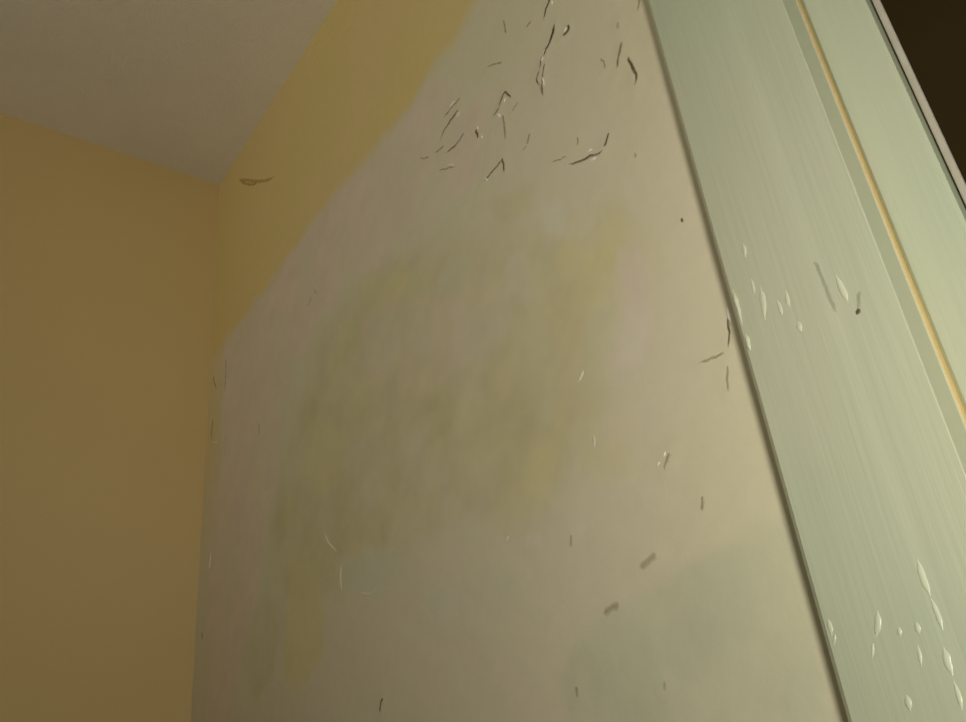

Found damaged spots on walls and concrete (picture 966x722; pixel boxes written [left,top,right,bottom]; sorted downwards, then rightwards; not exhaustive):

crack [503,0,569,95]
crack [604,46,637,82]
crack [422,99,463,171]
crack [496,91,530,143]
crack [555,133,609,164]